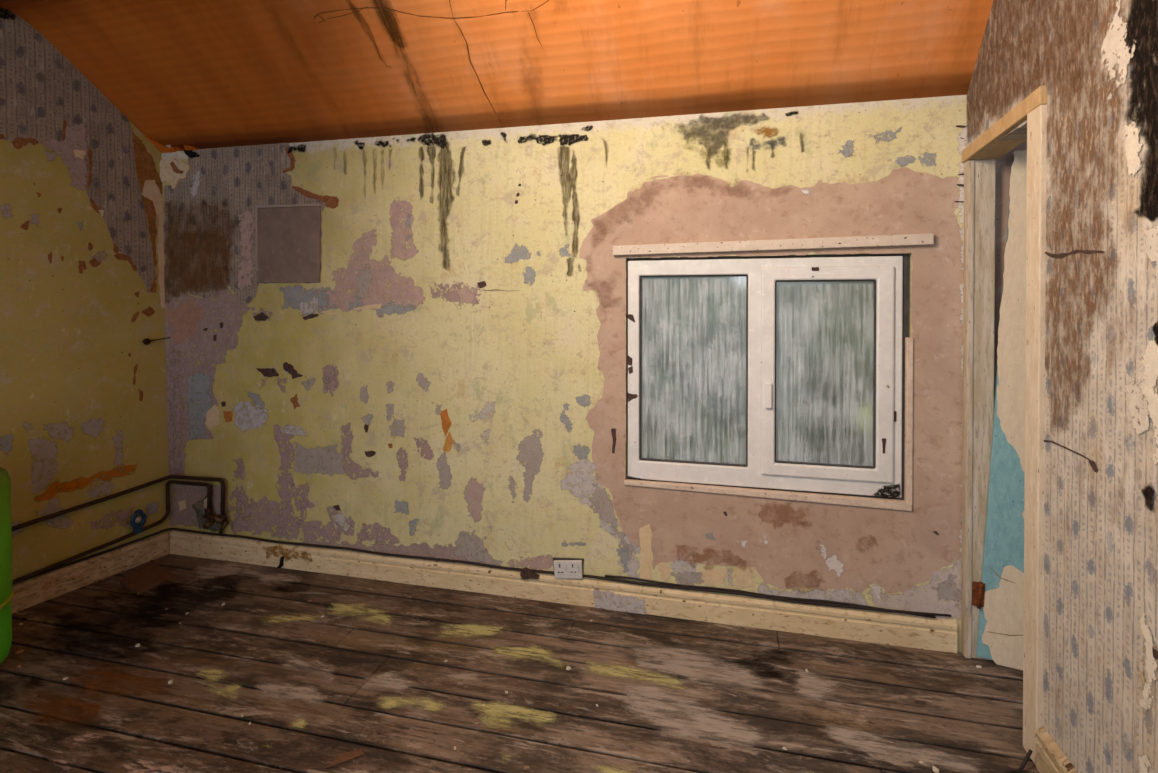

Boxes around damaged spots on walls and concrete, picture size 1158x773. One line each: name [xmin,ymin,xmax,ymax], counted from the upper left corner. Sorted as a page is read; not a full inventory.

crack [313,0,548,121]
flaking render [131,129,202,323]
peeling [252,200,487,322]
water stain [482,126,593,276]
water stain [679,114,785,169]
water stain [966,0,1158,427]
peeling [1124,121,1144,177]
flaking render [559,123,967,620]
peeling [1125,336,1158,465]
corrosion [35,464,137,501]
peeling [87,362,586,570]
peeling [982,565,1024,670]